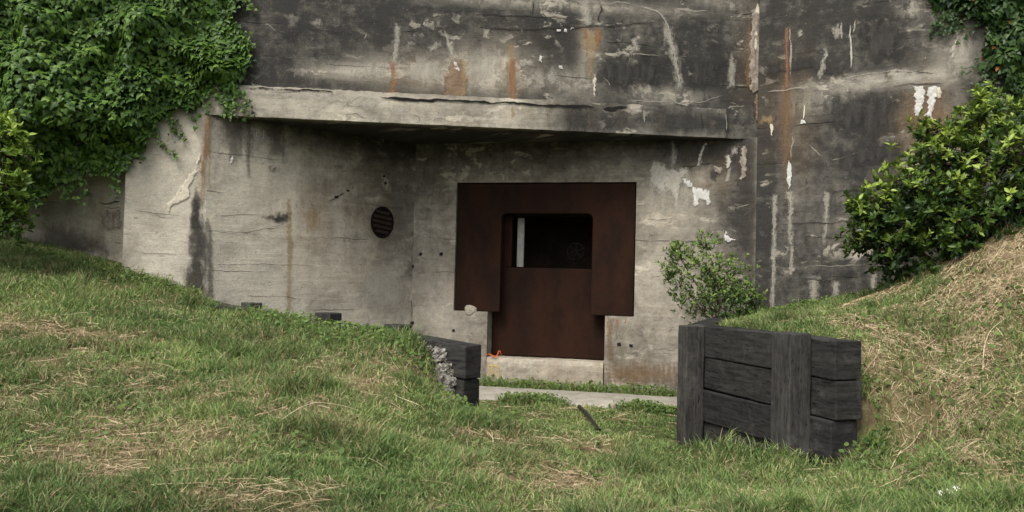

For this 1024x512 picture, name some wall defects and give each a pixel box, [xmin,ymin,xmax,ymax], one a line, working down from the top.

rust [390,26,399,93]
crack [246,1,727,131]
rust [782,28,792,156]
damp [765,4,942,170]
peeling [166,153,201,212]
peeling [682,178,711,206]
damp [187,193,209,294]